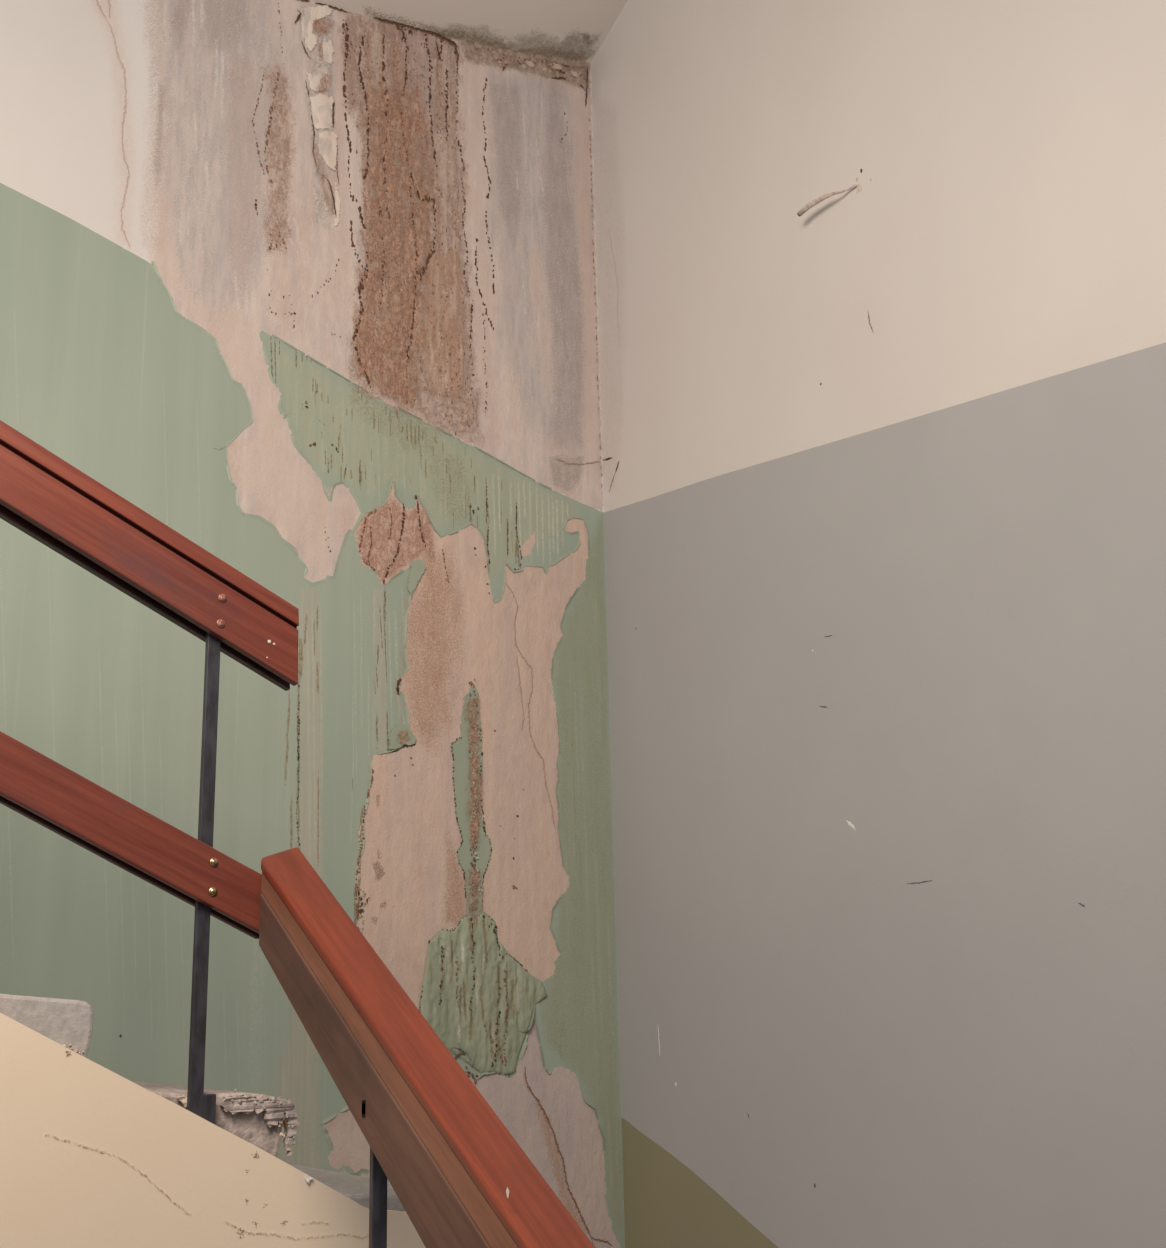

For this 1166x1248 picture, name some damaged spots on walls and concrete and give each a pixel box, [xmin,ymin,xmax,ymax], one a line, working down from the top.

crack [85,0,140,253]
leakage [145,0,307,333]
leakage [267,6,599,584]
peeling [138,0,603,1009]
crack [48,1134,188,1213]
spalling [220,1089,299,1156]
peeling [320,1106,370,1178]
peeling [448,1005,621,1248]